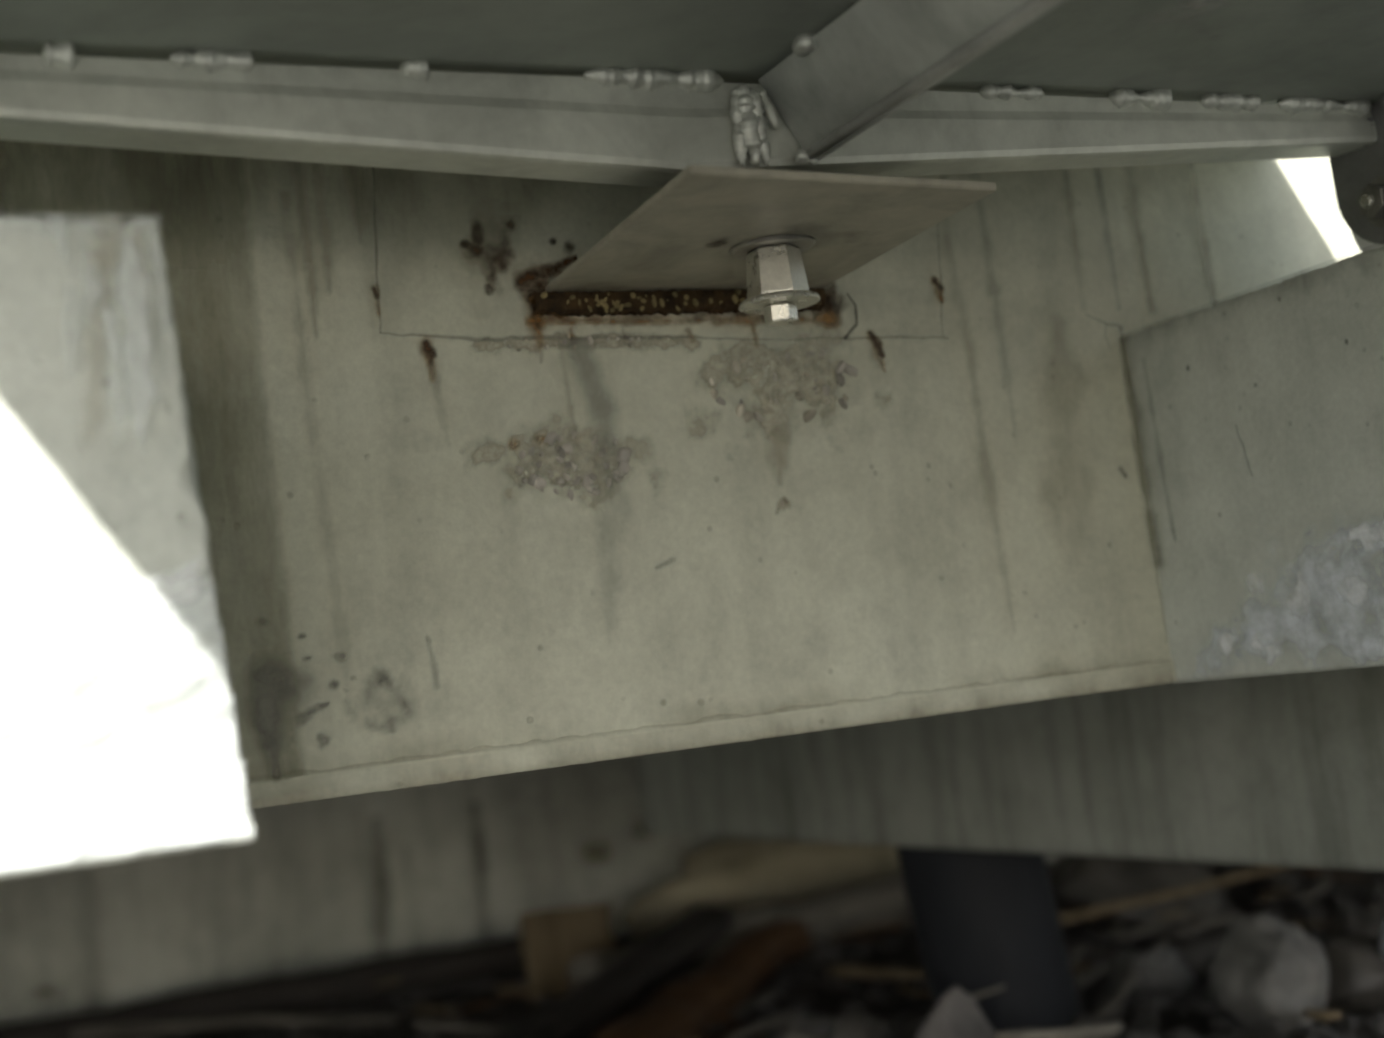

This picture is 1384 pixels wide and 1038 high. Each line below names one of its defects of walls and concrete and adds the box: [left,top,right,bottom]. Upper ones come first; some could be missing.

spalling [474,332,700,352]
corrosion [461,221,765,346]